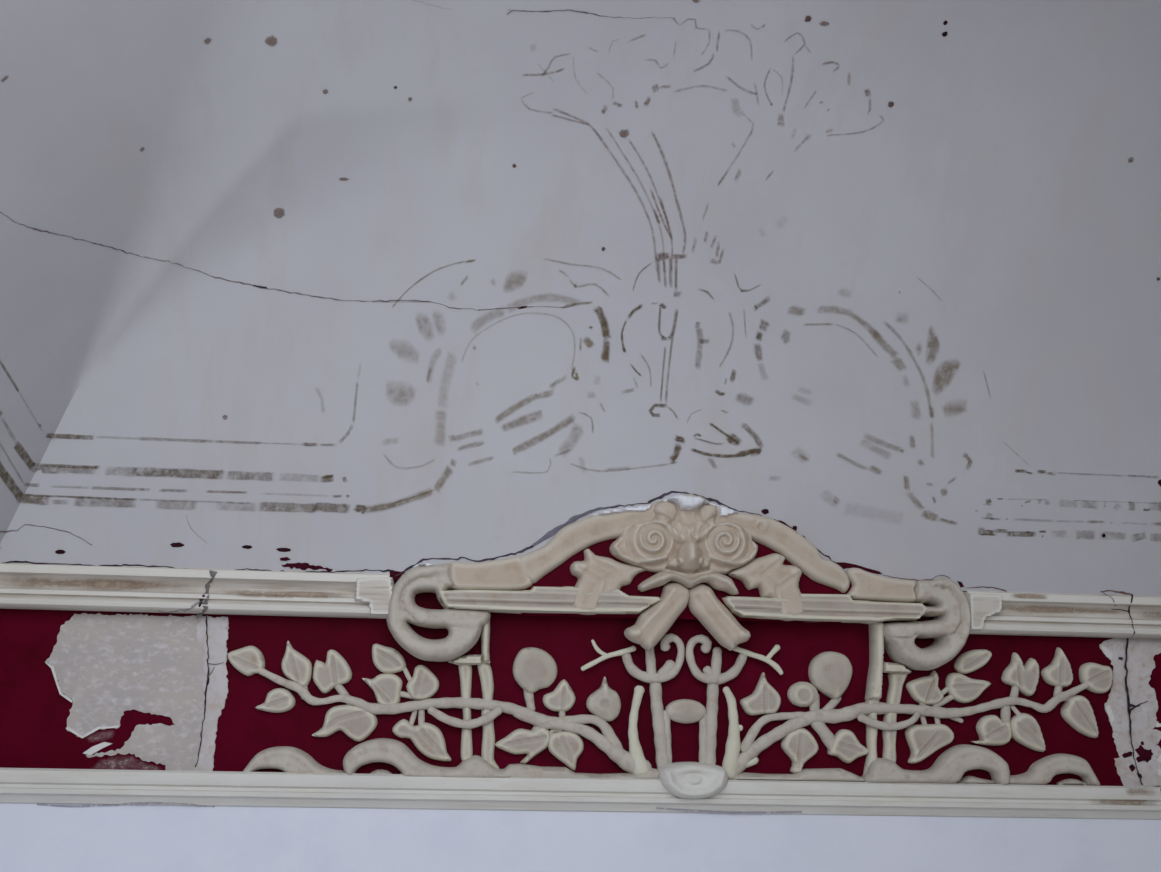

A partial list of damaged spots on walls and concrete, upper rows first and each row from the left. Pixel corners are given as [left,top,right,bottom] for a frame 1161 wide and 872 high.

crack [0,212,575,311]
crack [0,524,174,568]
peeling [45,613,229,771]
crack [158,491,1007,767]
peeling [1099,638,1161,805]
crack [1101,590,1161,790]